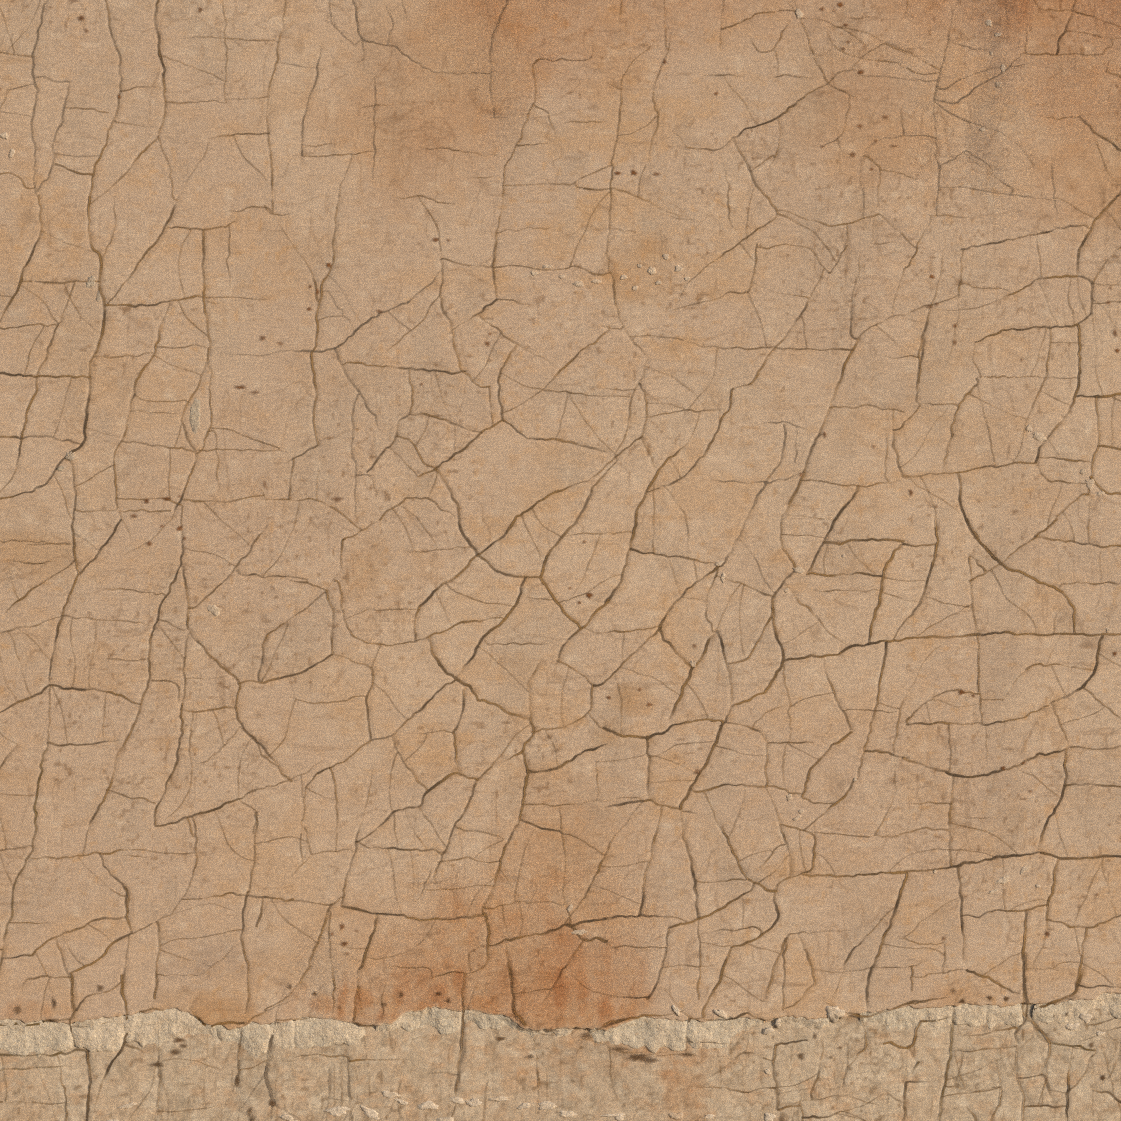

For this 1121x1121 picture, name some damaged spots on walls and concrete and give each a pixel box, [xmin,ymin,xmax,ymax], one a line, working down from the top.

crack [721,10,794,50]
crack [881,9,1100,123]
crack [580,71,627,124]
crack [1061,115,1121,166]
crack [584,159,644,200]
crack [711,48,847,294]
crack [0,0,577,1121]
crack [238,192,1121,1121]
spalling [0,992,845,1062]
spalling [860,993,1121,1047]
peeling [323,1105,380,1120]
peeling [382,1091,577,1121]